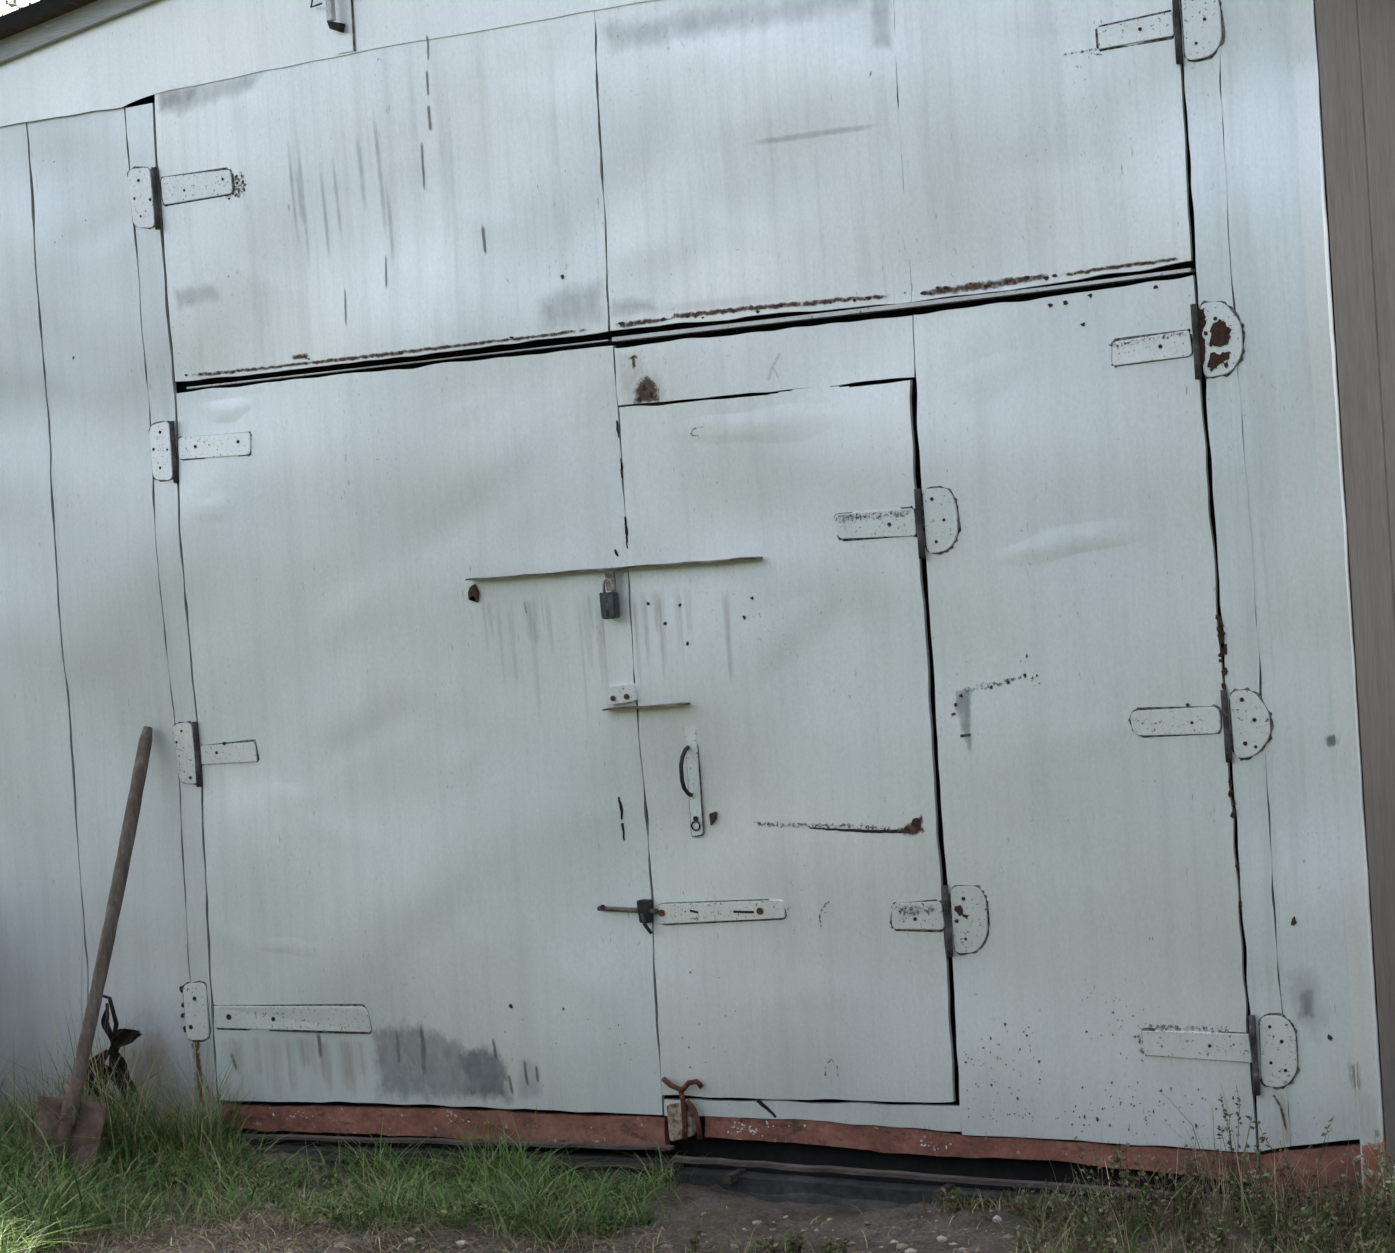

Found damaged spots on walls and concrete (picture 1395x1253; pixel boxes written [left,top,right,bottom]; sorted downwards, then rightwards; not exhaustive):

rust [618,295,884,328]
rust [631,355,659,404]